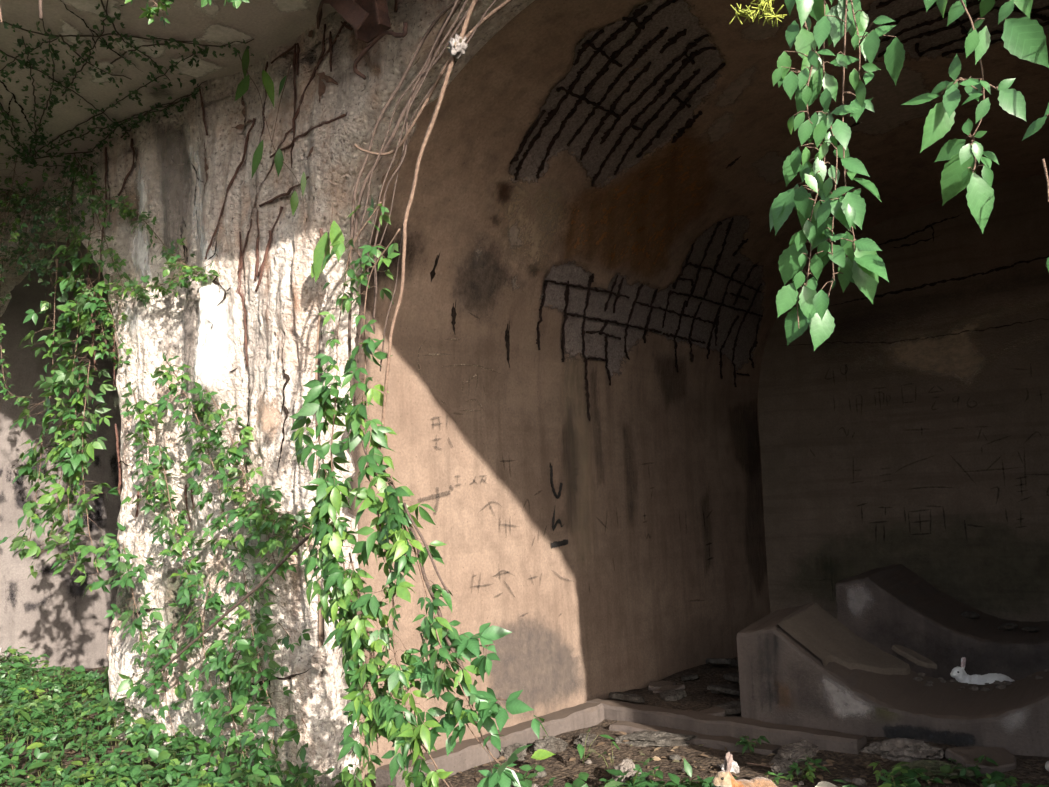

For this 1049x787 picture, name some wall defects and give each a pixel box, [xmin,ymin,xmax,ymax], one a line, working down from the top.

corrosion [317,72,338,103]
spalling [509,0,726,189]
crack [277,343,290,473]
spalling [536,215,765,421]